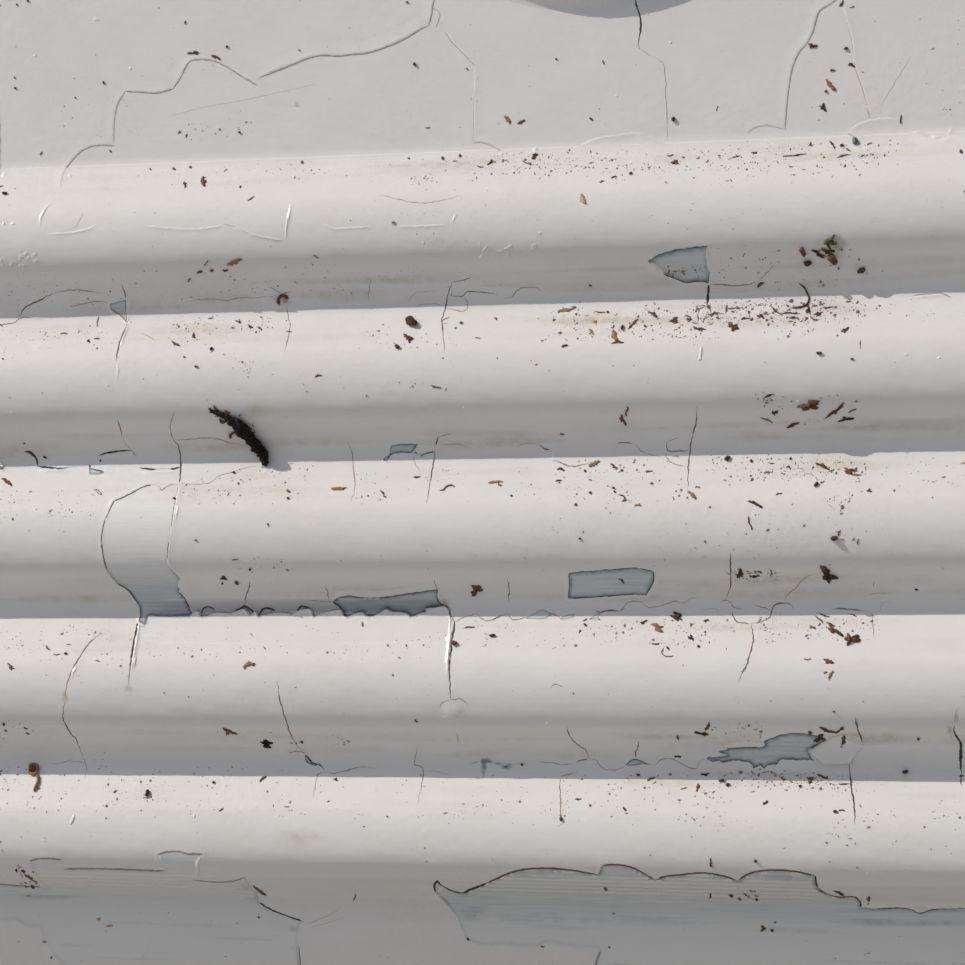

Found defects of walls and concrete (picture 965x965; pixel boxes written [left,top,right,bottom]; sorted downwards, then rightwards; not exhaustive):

crack [620,0,668,139]
peeling [643,239,775,320]
peeling [25,450,136,476]
peeling [95,467,718,677]
peeling [624,724,864,775]
peeling [0,841,311,965]
peeling [425,854,965,965]